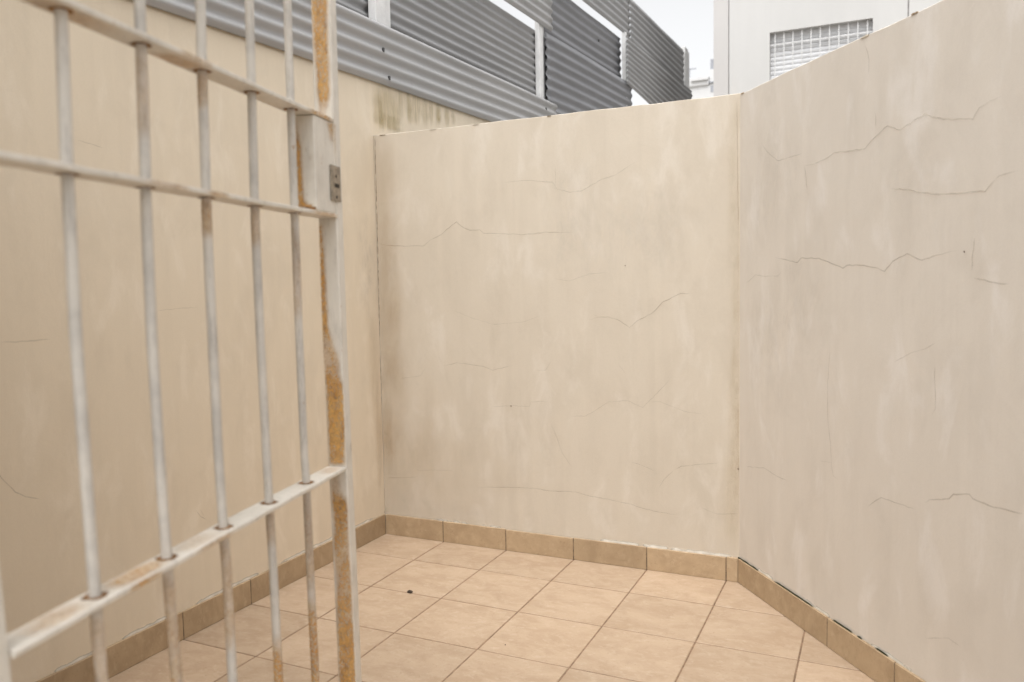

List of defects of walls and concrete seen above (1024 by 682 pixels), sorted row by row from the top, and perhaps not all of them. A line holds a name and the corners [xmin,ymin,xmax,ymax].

corrosion [312,0,332,130]
corrosion [320,227,345,463]
corrosion [309,612,319,682]
corrosion [333,492,355,682]